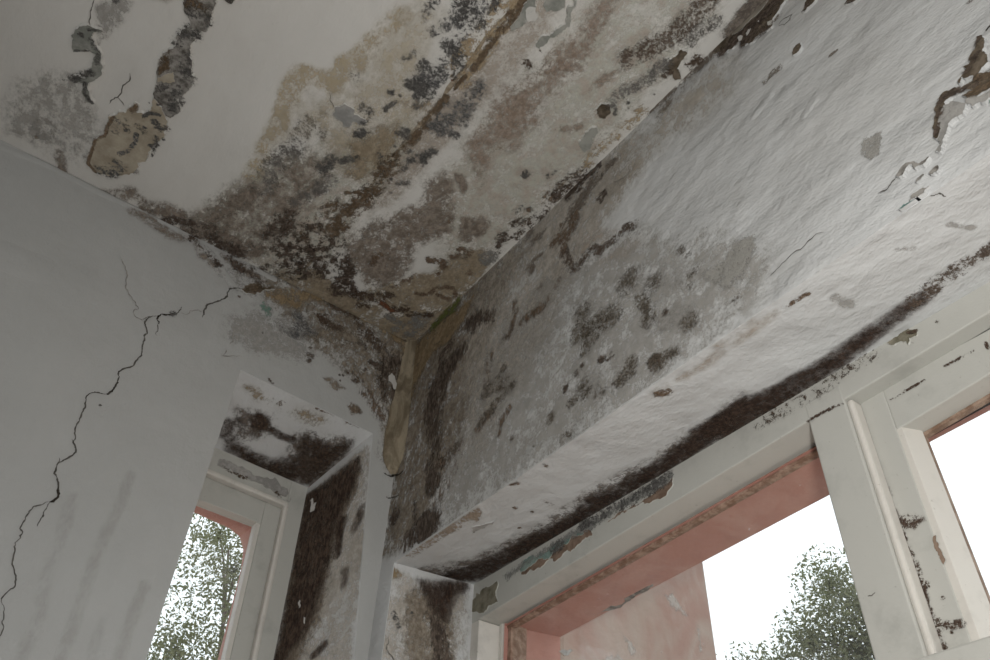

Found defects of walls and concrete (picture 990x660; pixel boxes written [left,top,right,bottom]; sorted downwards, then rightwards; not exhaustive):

leakage [12,75,96,172]
peeling [63,22,105,104]
peeling [86,0,235,178]
peeling [510,0,577,52]
peeling [578,102,630,157]
flaking render [647,0,818,119]
flaking render [880,25,990,212]
leakage [103,0,766,557]
crack [0,259,241,636]
leakage [220,408,368,660]
peeling [472,471,674,615]
leakage [383,242,990,660]